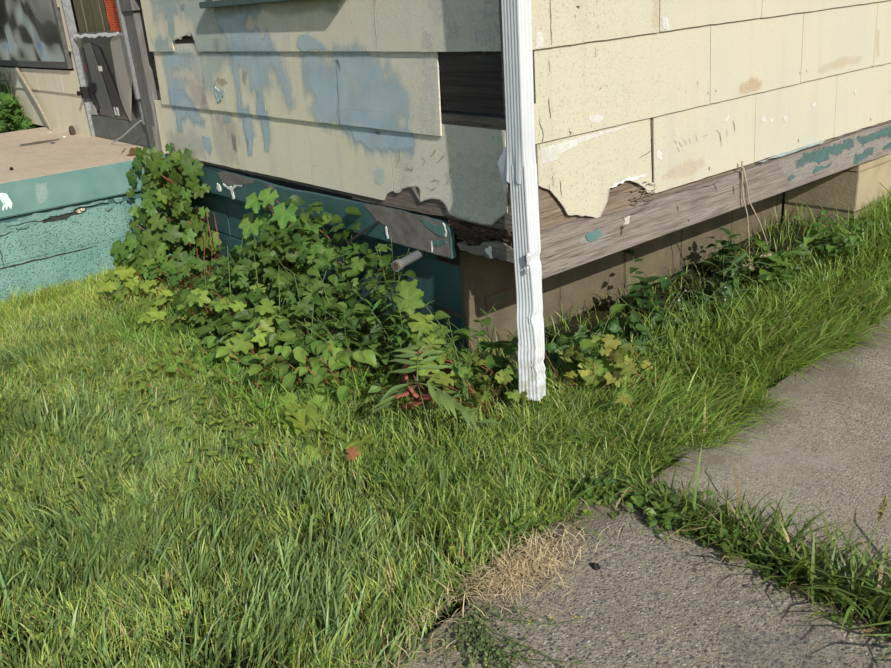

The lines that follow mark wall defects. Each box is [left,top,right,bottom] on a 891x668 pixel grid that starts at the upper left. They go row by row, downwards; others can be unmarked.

peeling [541,114,630,164]
peeling [759,126,891,181]
spalling [0,197,123,236]
peeling [365,197,504,258]
spalling [538,174,656,218]